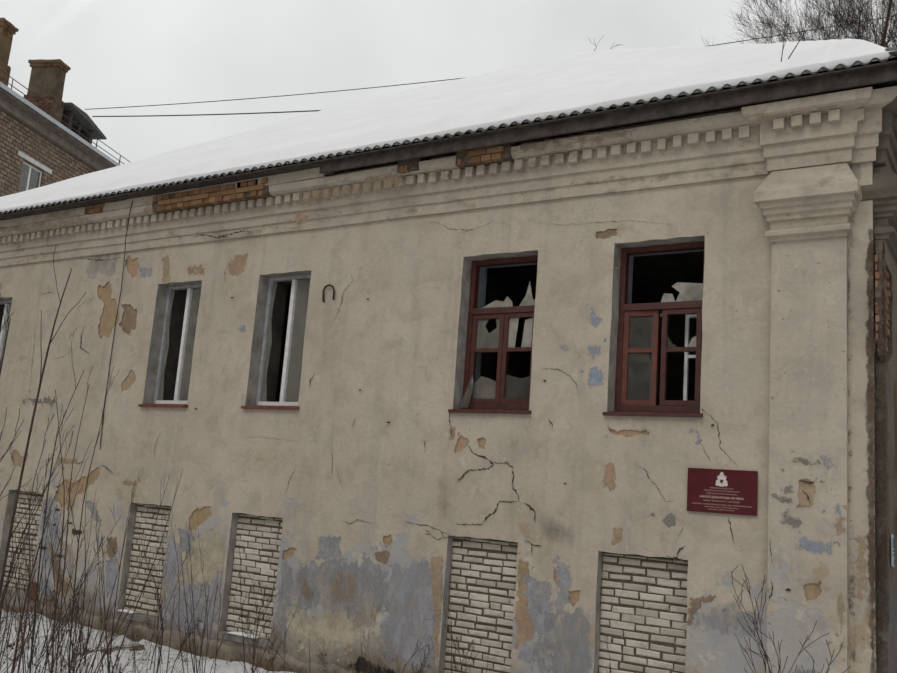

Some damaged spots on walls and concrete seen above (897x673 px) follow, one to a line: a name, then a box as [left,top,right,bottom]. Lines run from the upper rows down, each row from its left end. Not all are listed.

flaking render [151,178,268,213]
peeling [228,253,248,276]
flaking render [97,281,137,338]
flaking render [875,240,893,363]
flaking render [606,425,649,437]
crack [405,412,542,552]
flaking render [787,478,816,510]
flaking render [38,467,102,596]
peeling [159,506,227,636]
peeling [513,553,592,673]
flaking render [803,580,822,601]